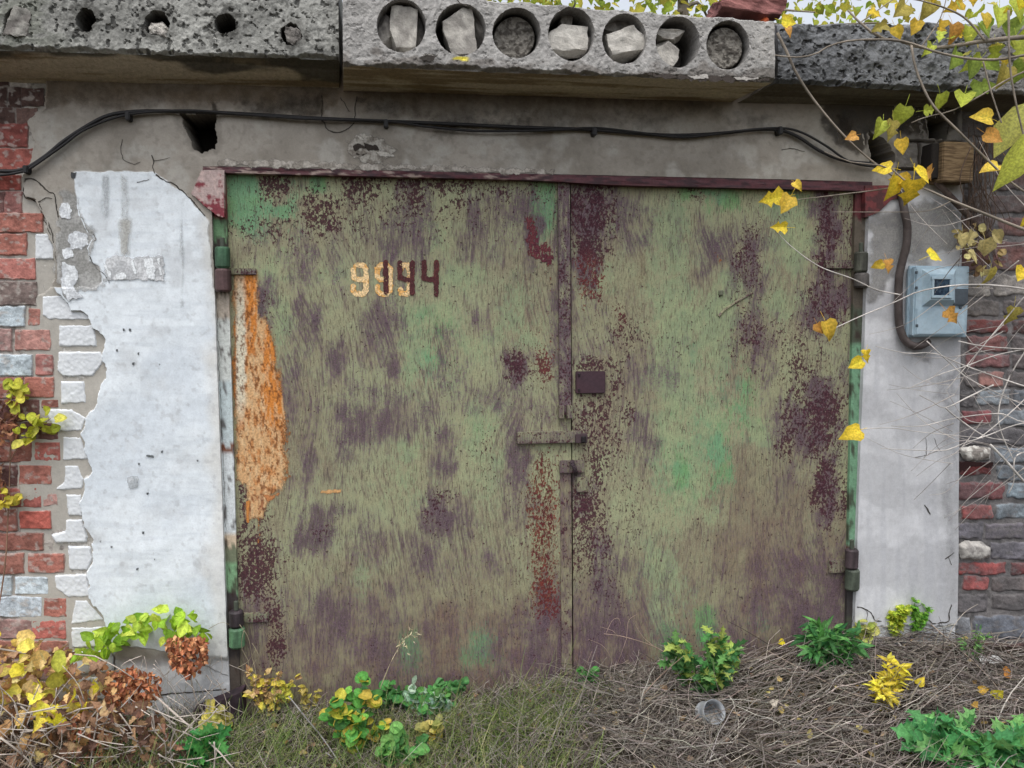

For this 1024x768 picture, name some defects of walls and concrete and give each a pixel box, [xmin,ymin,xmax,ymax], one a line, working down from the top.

flaking render [217,133,555,175]
corrosion [523,215,554,287]
flaking render [35,190,165,717]
corrosion [232,274,291,543]
corrosion [521,452,557,620]